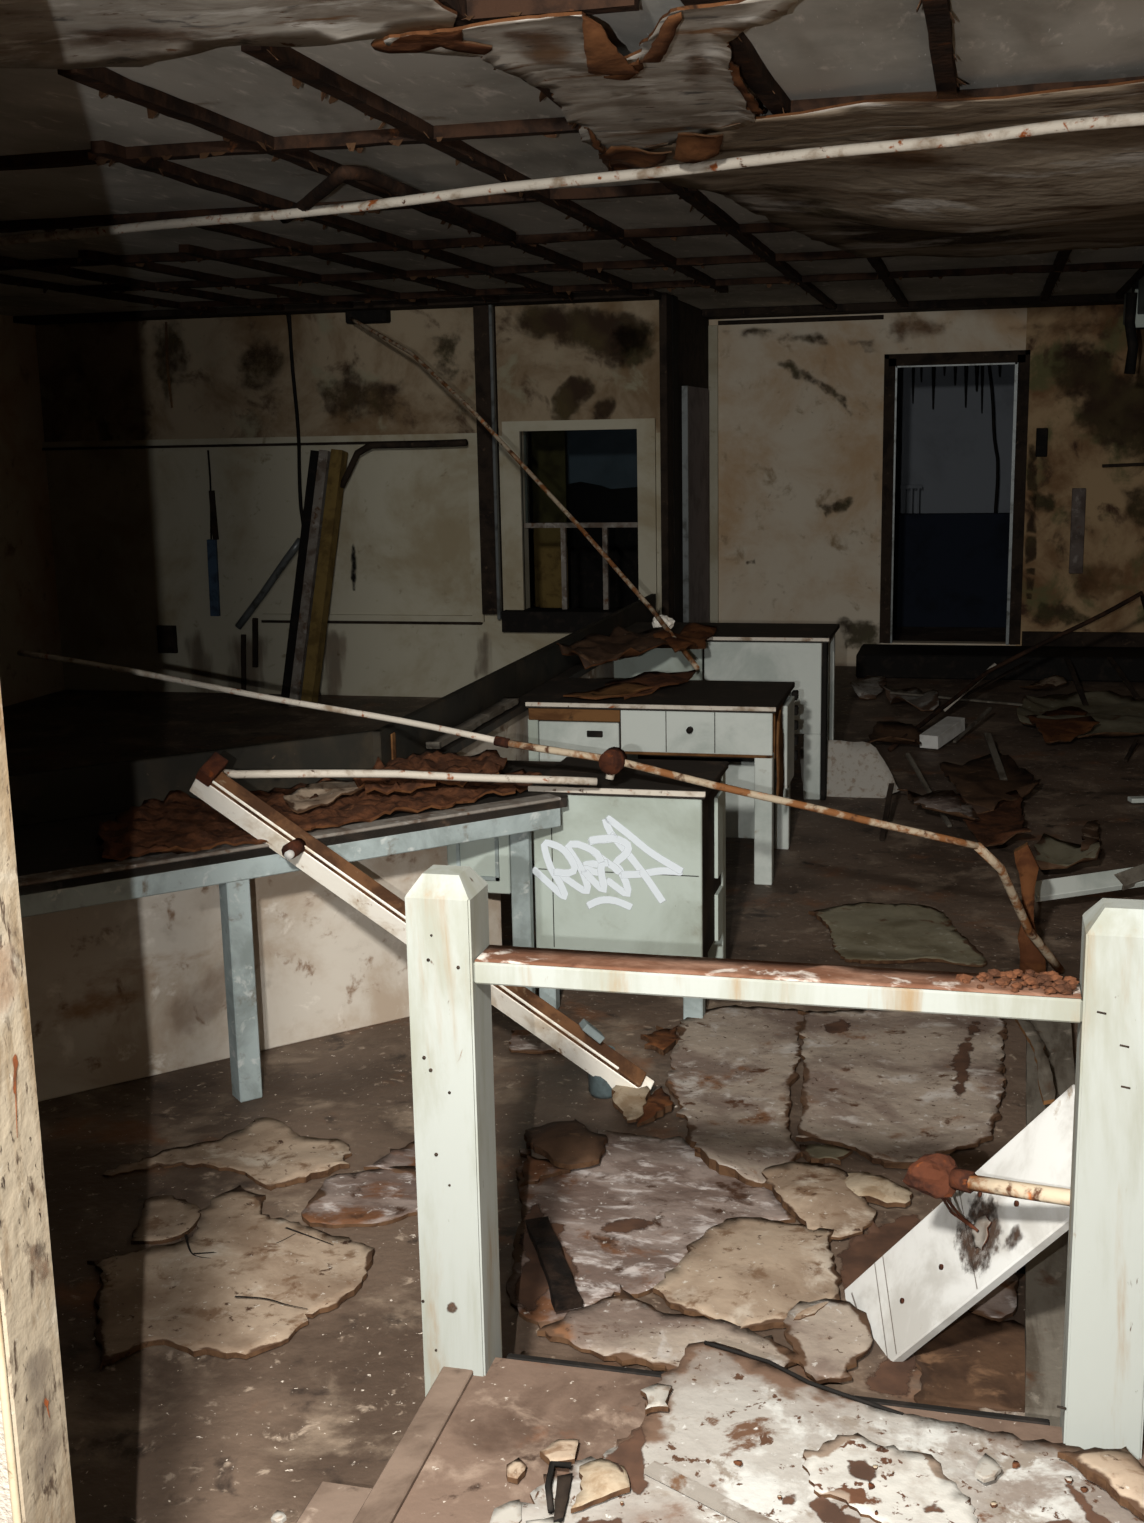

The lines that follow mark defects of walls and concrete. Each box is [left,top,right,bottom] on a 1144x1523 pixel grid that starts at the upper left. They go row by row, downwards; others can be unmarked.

water stain [519,306,652,367]
water stain [322,370,397,414]
water stain [552,376,615,420]
water stain [1054,326,1144,457]
water stain [1025,446,1114,624]
peeling [971,1216,992,1250]
peeling [975,1453,1020,1483]